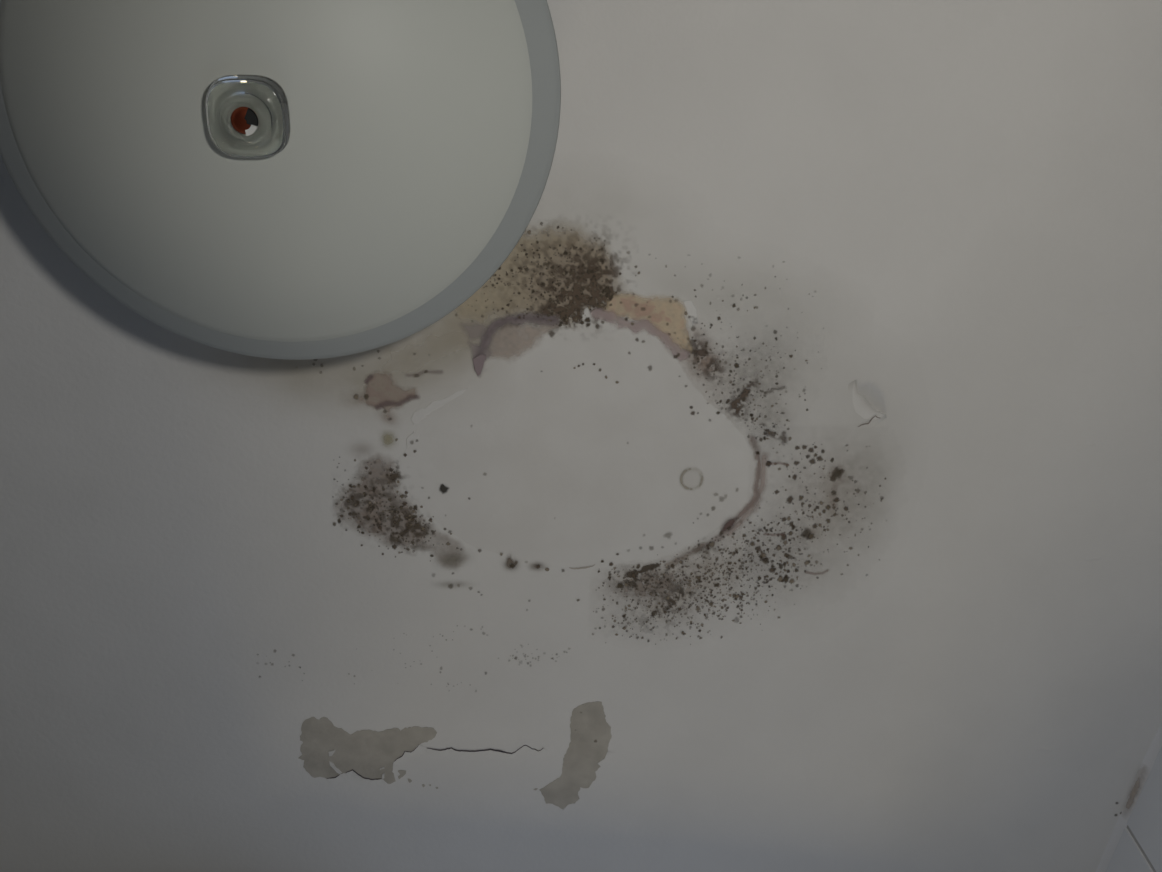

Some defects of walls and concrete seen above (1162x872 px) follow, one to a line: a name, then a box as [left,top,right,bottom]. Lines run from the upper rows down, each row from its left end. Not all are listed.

leakage [457,226,621,336]
peeling [844,380,887,428]
leakage [333,450,458,562]
leakage [593,317,869,642]
peeling [299,717,438,789]
crack [425,738,550,762]
peeling [534,701,615,817]